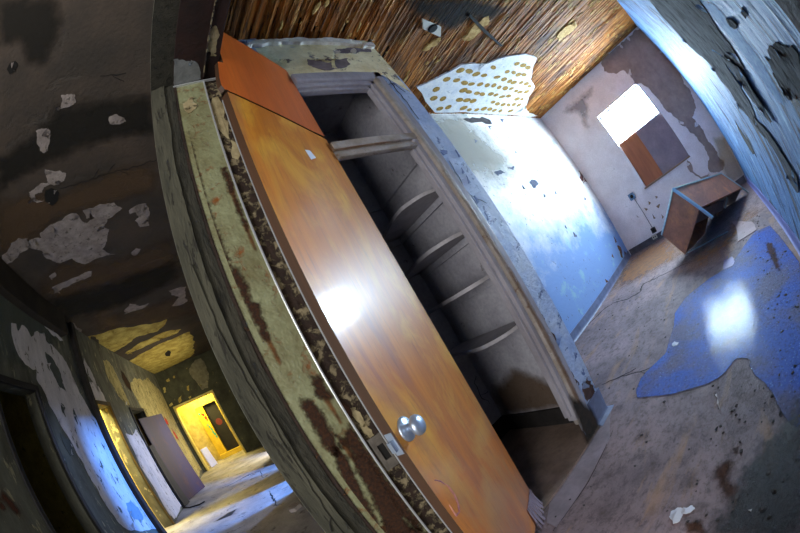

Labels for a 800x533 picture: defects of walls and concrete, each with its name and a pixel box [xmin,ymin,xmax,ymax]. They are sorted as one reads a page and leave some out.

peeling [36,128,51,153]
peeling [56,94,76,111]
peeling [108,114,126,125]
peeling [247,37,412,94]
flaking render [601,29,725,179]
flaking render [650,0,800,193]
peeling [28,169,66,204]
peeling [2,203,150,293]
peeling [11,323,156,531]
peeling [68,319,209,477]